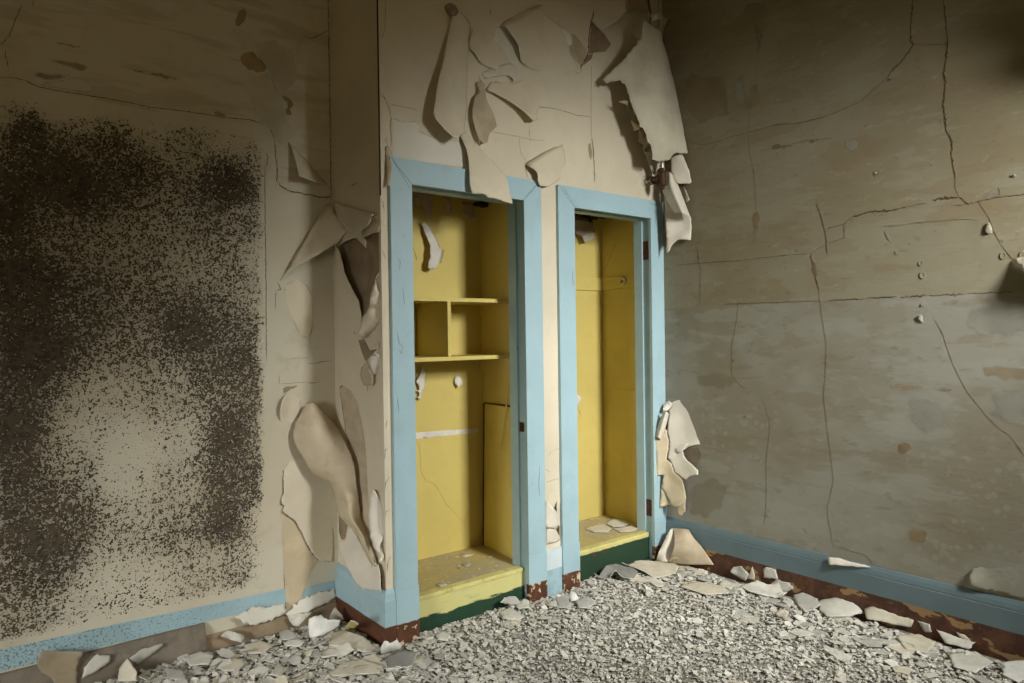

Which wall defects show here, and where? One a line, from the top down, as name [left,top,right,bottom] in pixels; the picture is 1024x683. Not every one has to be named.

damp [0,100,264,643]
peeling [183,385,417,677]
peeling [280,201,380,386]
peeling [413,192,444,270]
peeling [385,3,611,204]
peeling [575,218,595,243]
peeling [603,12,692,253]
peeling [656,400,700,516]
crack [678,0,1024,566]
peeling [969,564,1024,599]